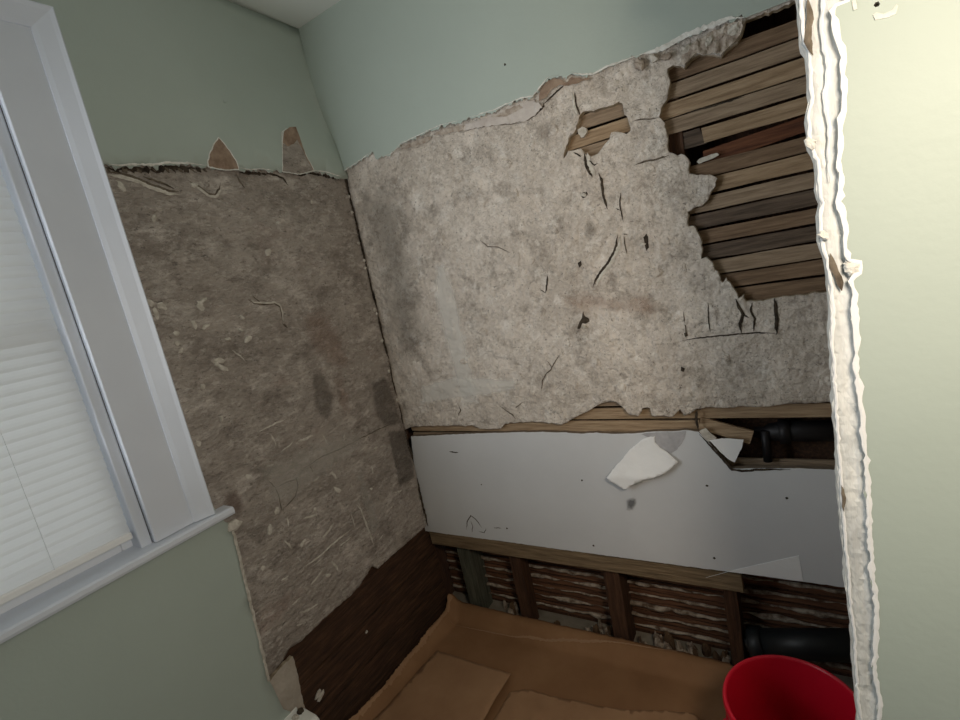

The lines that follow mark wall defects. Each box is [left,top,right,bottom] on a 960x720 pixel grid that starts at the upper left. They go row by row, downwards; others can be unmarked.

flaking render [104,127,427,675]
flaking render [344,0,883,720]